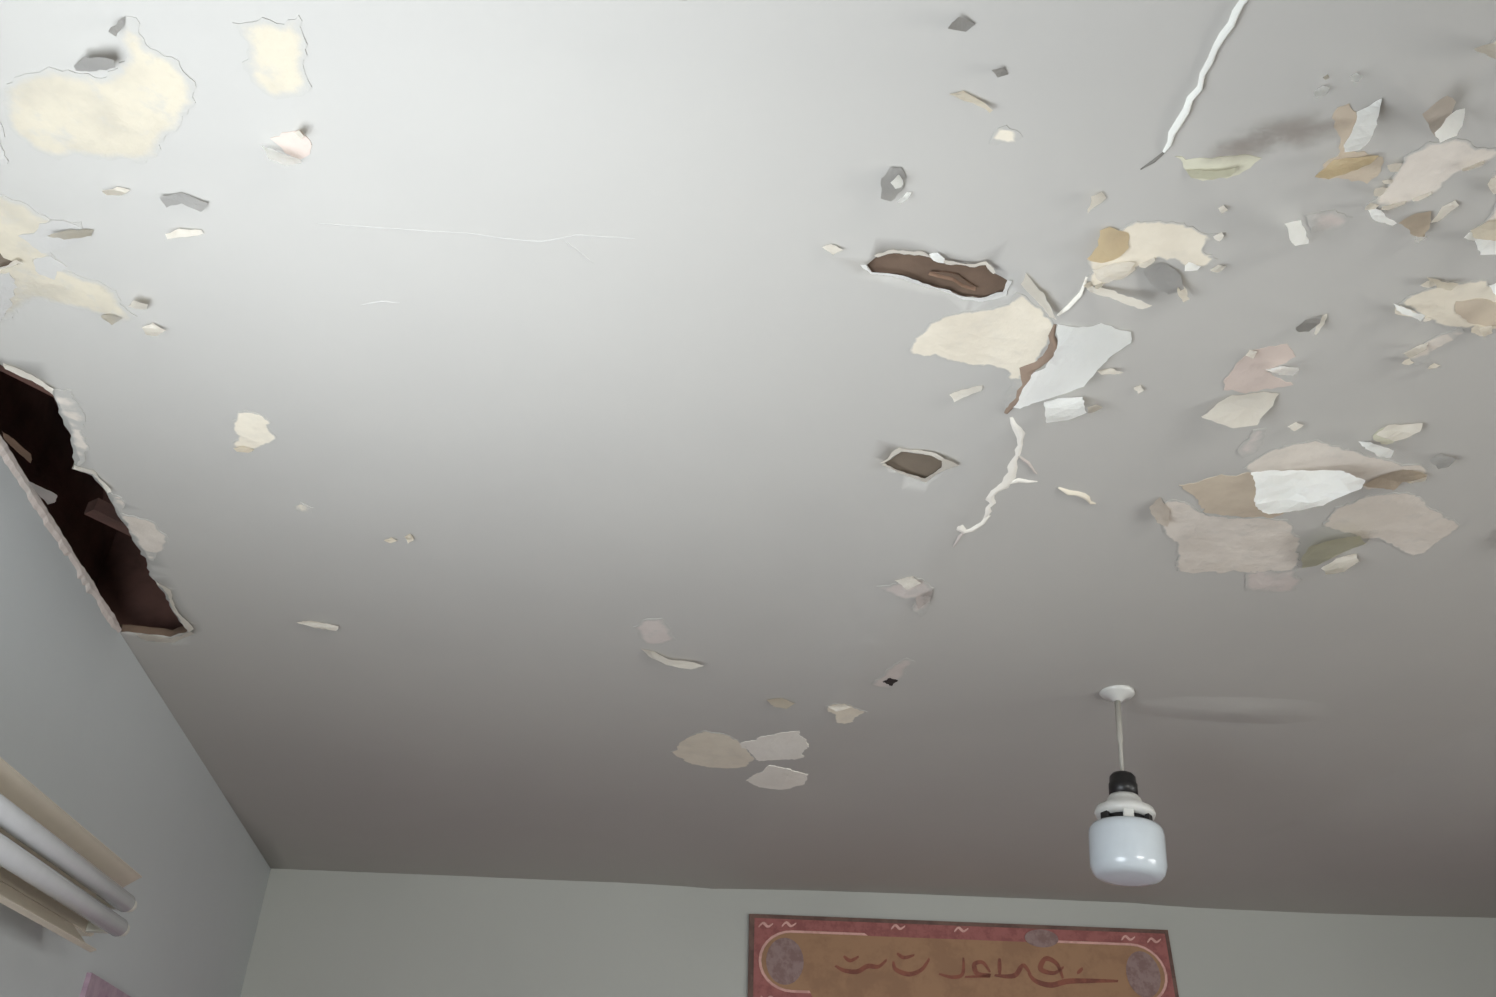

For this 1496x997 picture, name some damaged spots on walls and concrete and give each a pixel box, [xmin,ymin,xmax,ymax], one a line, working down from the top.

peeling [0,16,196,165]
crack [1140,0,1248,170]
peeling [1285,74,1496,255]
peeling [0,194,166,336]
spalling [3,363,168,561]
flaking render [0,435,194,643]
peeling [232,410,277,453]
peeling [909,274,1132,423]
crack [953,277,1096,547]
peeling [1149,314,1460,593]
peeling [1393,277,1496,369]
peeling [670,730,809,790]